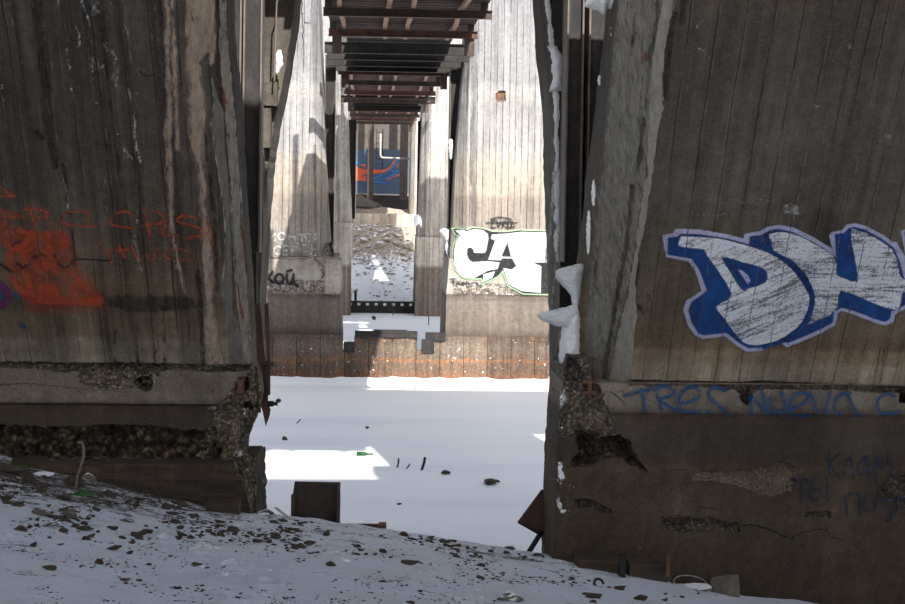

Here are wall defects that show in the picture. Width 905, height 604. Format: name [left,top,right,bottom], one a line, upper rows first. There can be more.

spalling [0,362,267,514]
spalling [551,382,649,472]
spalling [658,514,743,533]
spalling [688,461,803,497]